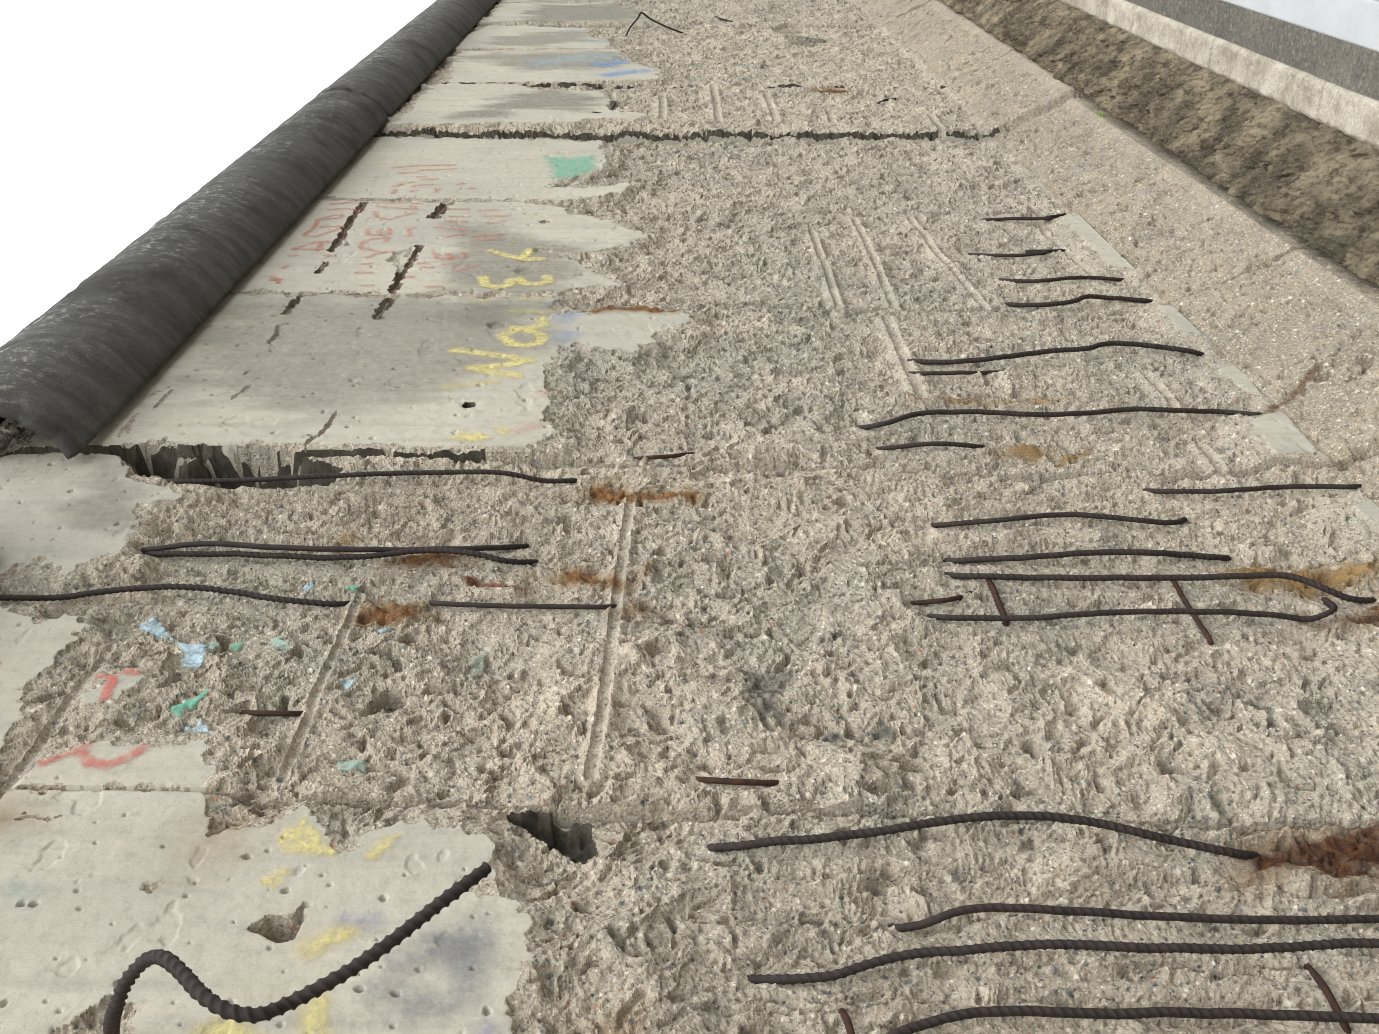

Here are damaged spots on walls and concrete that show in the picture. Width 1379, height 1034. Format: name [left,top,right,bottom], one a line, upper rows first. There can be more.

spalling [374,0,991,141]
spalling [240,136,1333,484]
spalling [0,419,50,456]
rust [1226,562,1379,599]
rust [1342,606,1379,626]
spalling [0,436,1379,1034]
rust [1248,824,1379,879]